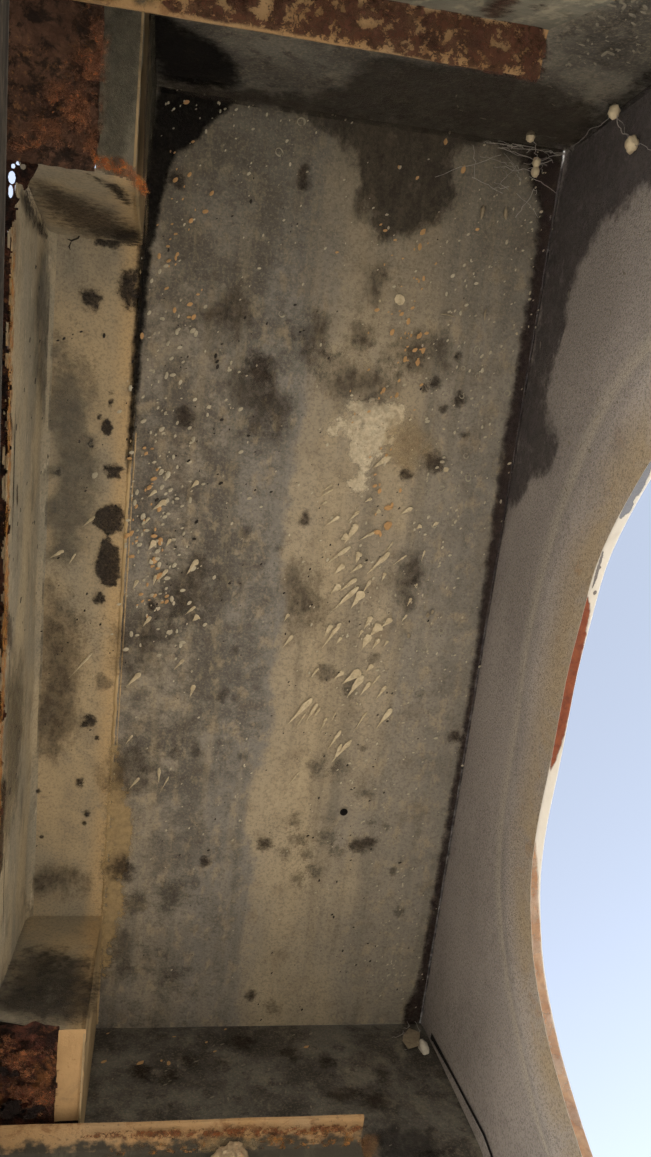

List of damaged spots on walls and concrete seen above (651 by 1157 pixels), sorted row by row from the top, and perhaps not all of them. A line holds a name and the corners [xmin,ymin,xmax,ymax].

corrosion [160,0,547,83]
corrosion [9,3,149,195]
corrosion [157,209,208,267]
corrosion [374,276,429,366]
corrosion [0,229,18,875]
damp [92,505,124,605]
corrosion [124,468,169,618]
damp [301,85,651,1024]
corrosion [550,596,590,769]
corrosion [0,1035,58,1115]
corrosion [81,1125,367,1156]